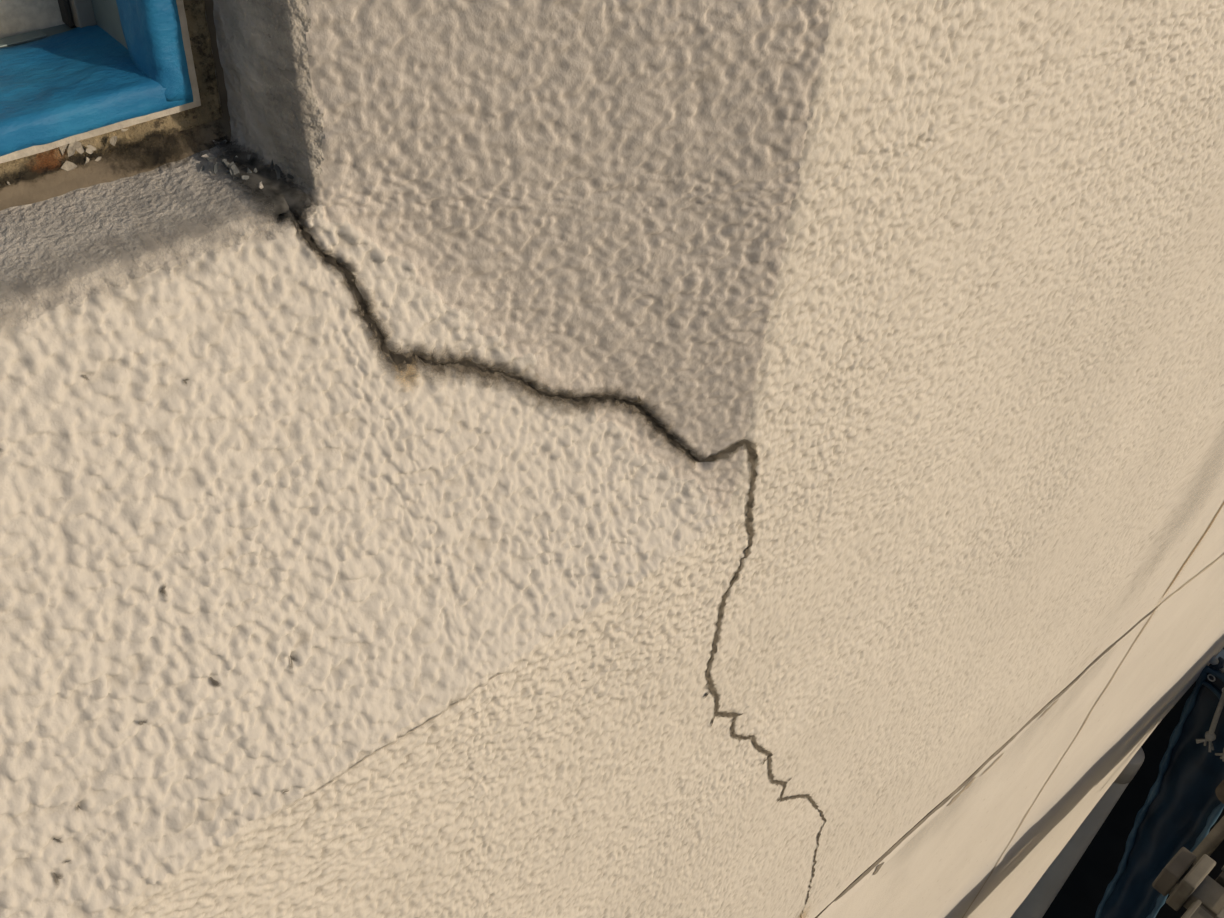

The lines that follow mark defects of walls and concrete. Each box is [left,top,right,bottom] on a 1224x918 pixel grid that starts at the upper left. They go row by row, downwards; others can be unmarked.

crack [287,214,827,918]